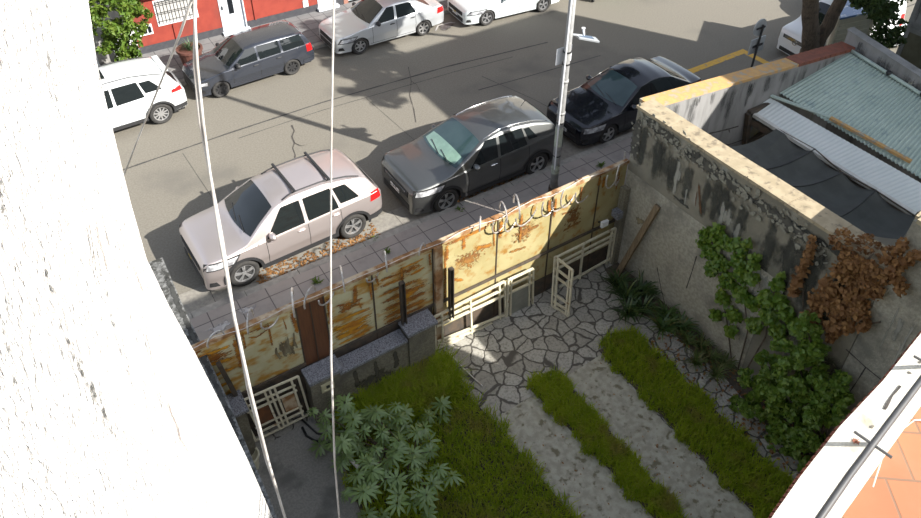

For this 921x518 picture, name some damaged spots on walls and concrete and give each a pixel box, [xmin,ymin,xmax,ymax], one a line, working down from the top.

rust [547,187,583,232]
leakage [637,122,756,238]
peeling [630,103,828,266]
rust [326,254,431,345]
rust [444,214,539,305]
leakage [754,222,841,311]